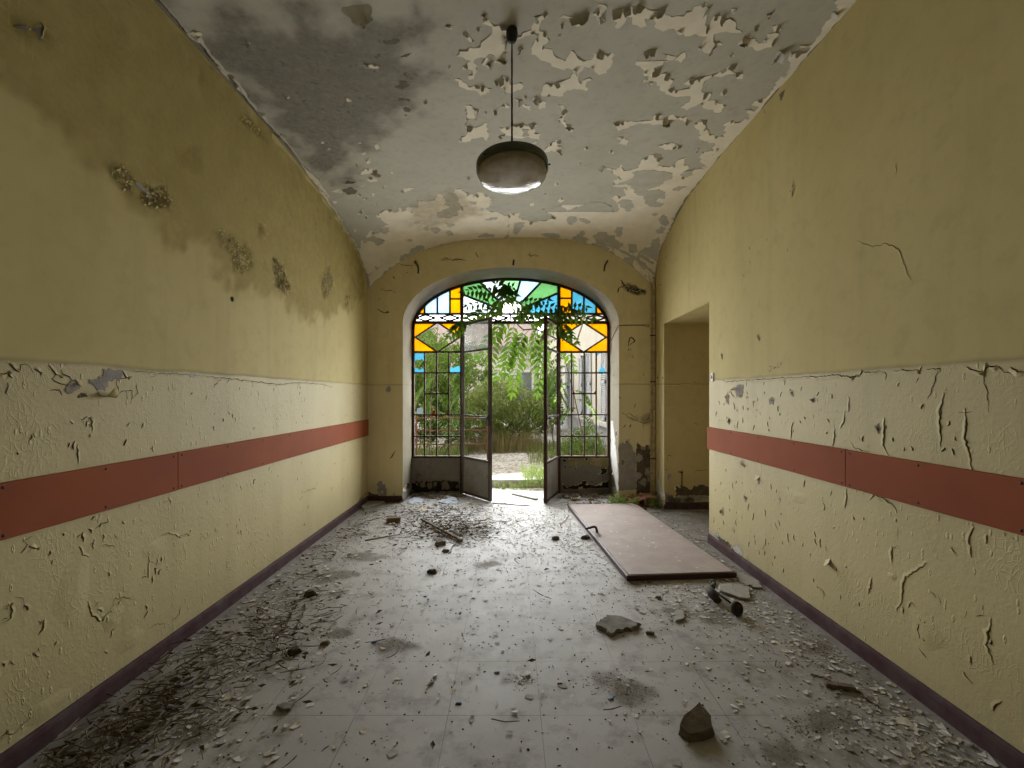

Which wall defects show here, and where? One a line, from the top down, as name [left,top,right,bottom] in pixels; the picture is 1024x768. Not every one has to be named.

leakage [206,3,424,171]
peeling [302,0,856,286]
leakage [217,229,253,275]
leakage [272,258,290,291]
crack [857,241,911,280]
spalling [64,368,123,398]
spalling [725,384,744,424]
spalling [39,420,987,768]